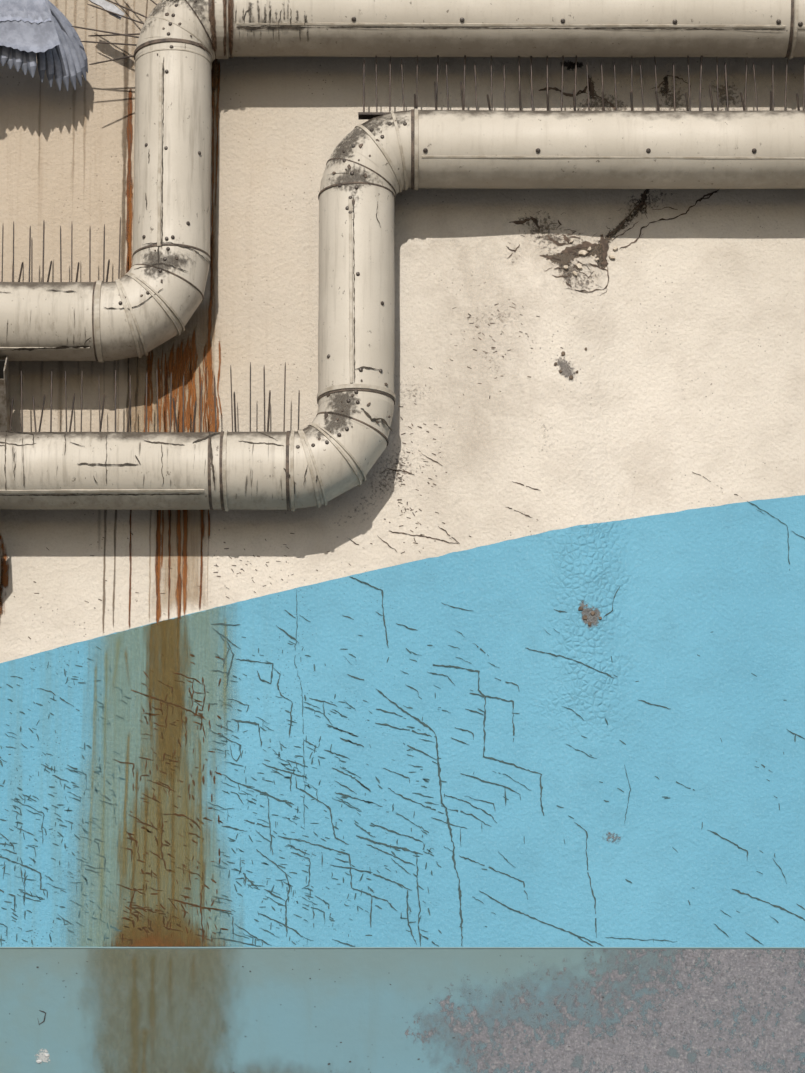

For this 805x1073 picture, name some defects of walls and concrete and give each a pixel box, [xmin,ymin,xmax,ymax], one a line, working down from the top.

corrosion [121,4,133,278]
corrosion [126,0,233,432]
flaking render [554,351,578,380]
corrosion [0,535,9,617]
crack [351,526,460,552]
crack [692,472,805,571]
corrosion [81,510,227,947]
crack [755,730,804,810]
crack [701,822,805,944]
peeling [405,949,805,1073]